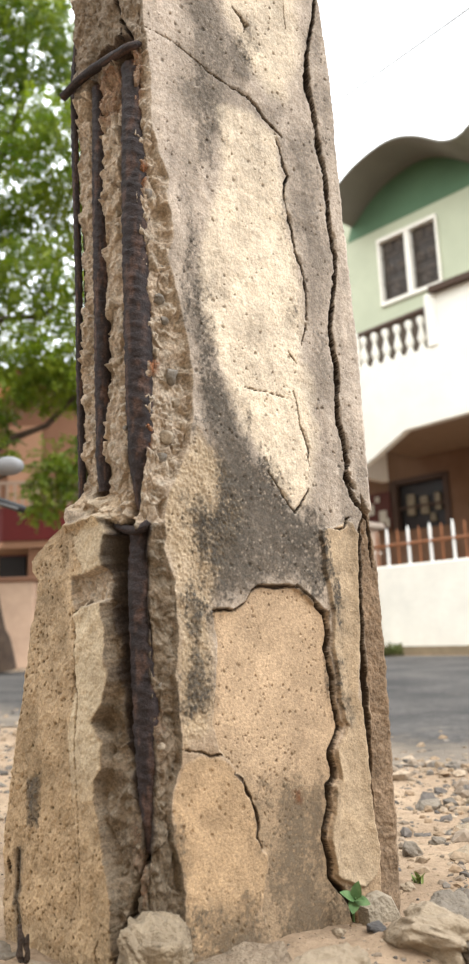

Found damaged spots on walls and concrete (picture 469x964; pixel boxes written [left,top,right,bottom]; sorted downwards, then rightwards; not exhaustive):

peeling [71,0,401,957]
crack [115,0,374,807]
water stain [179,229,342,721]